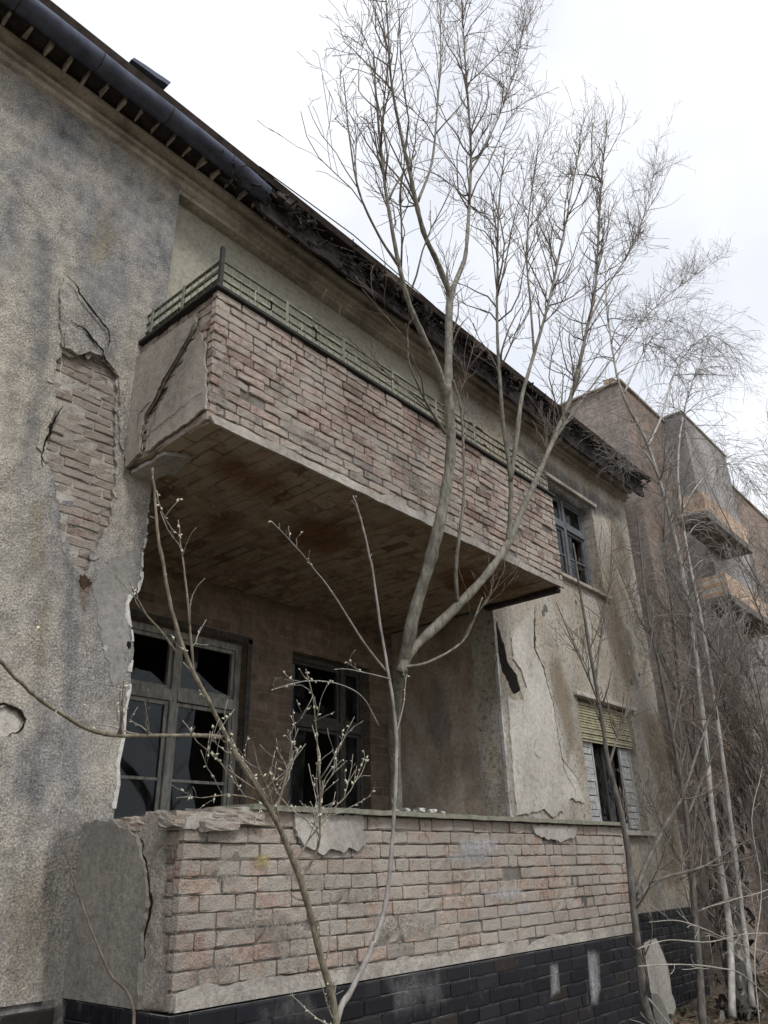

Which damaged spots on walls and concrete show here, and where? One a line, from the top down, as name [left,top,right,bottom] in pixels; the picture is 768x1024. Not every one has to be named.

flaking render [42,353,120,589]
crack [124,313,208,468]
flaking render [0,702,27,737]
peeling [494,604,585,842]
crack [534,607,578,802]